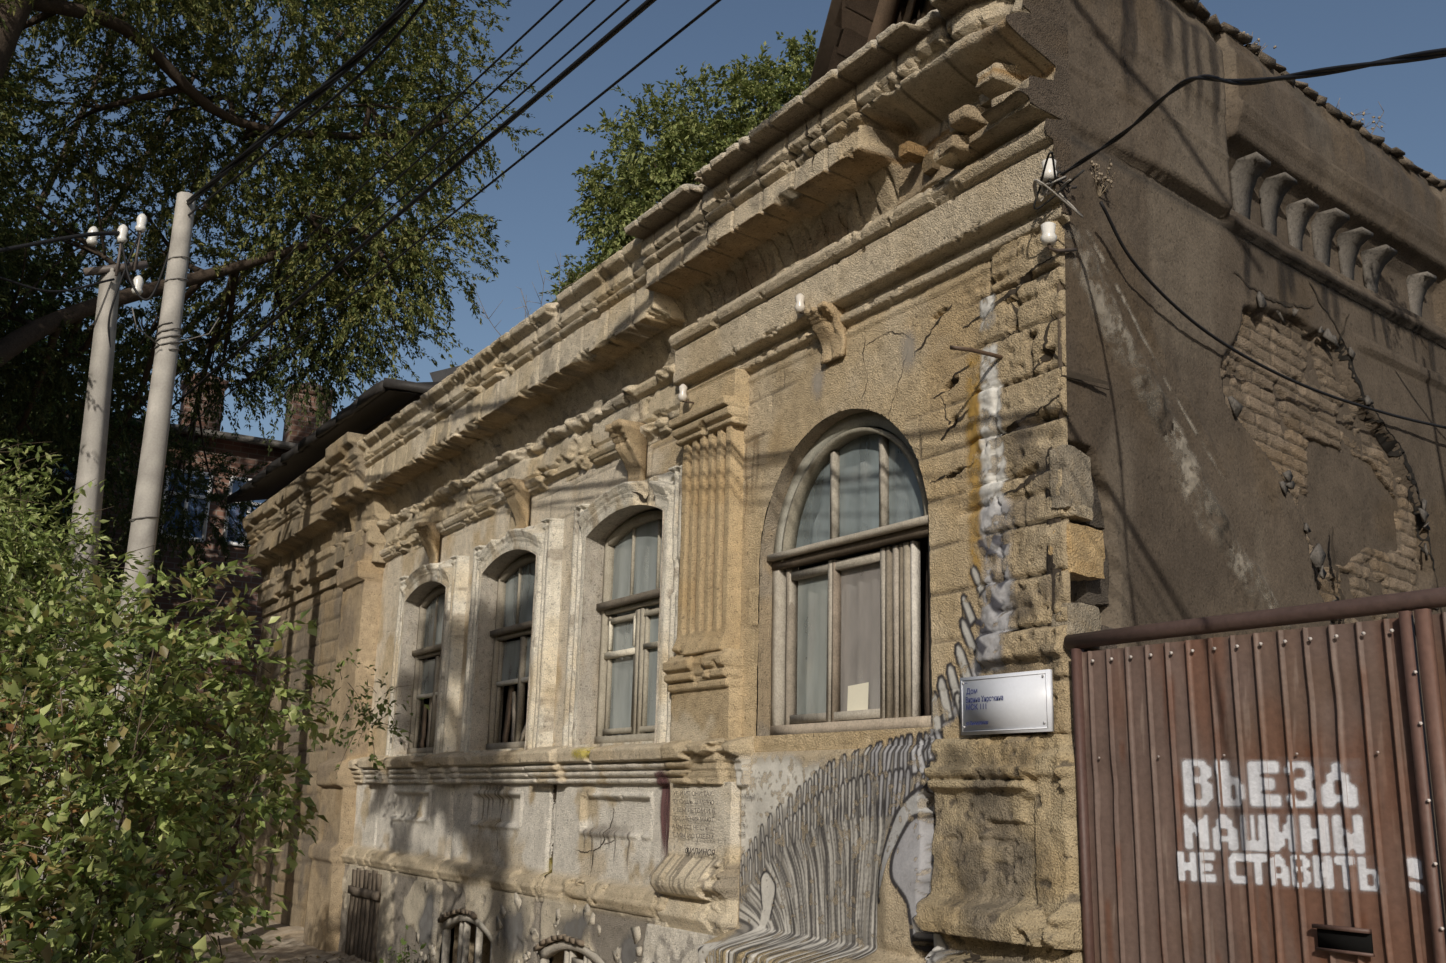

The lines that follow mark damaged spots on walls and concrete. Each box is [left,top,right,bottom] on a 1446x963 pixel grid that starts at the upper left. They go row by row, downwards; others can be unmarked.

crack [862,256,1110,484]
crack [992,463,1050,499]
flaking render [1220,291,1430,602]
flaking render [1330,611,1415,625]